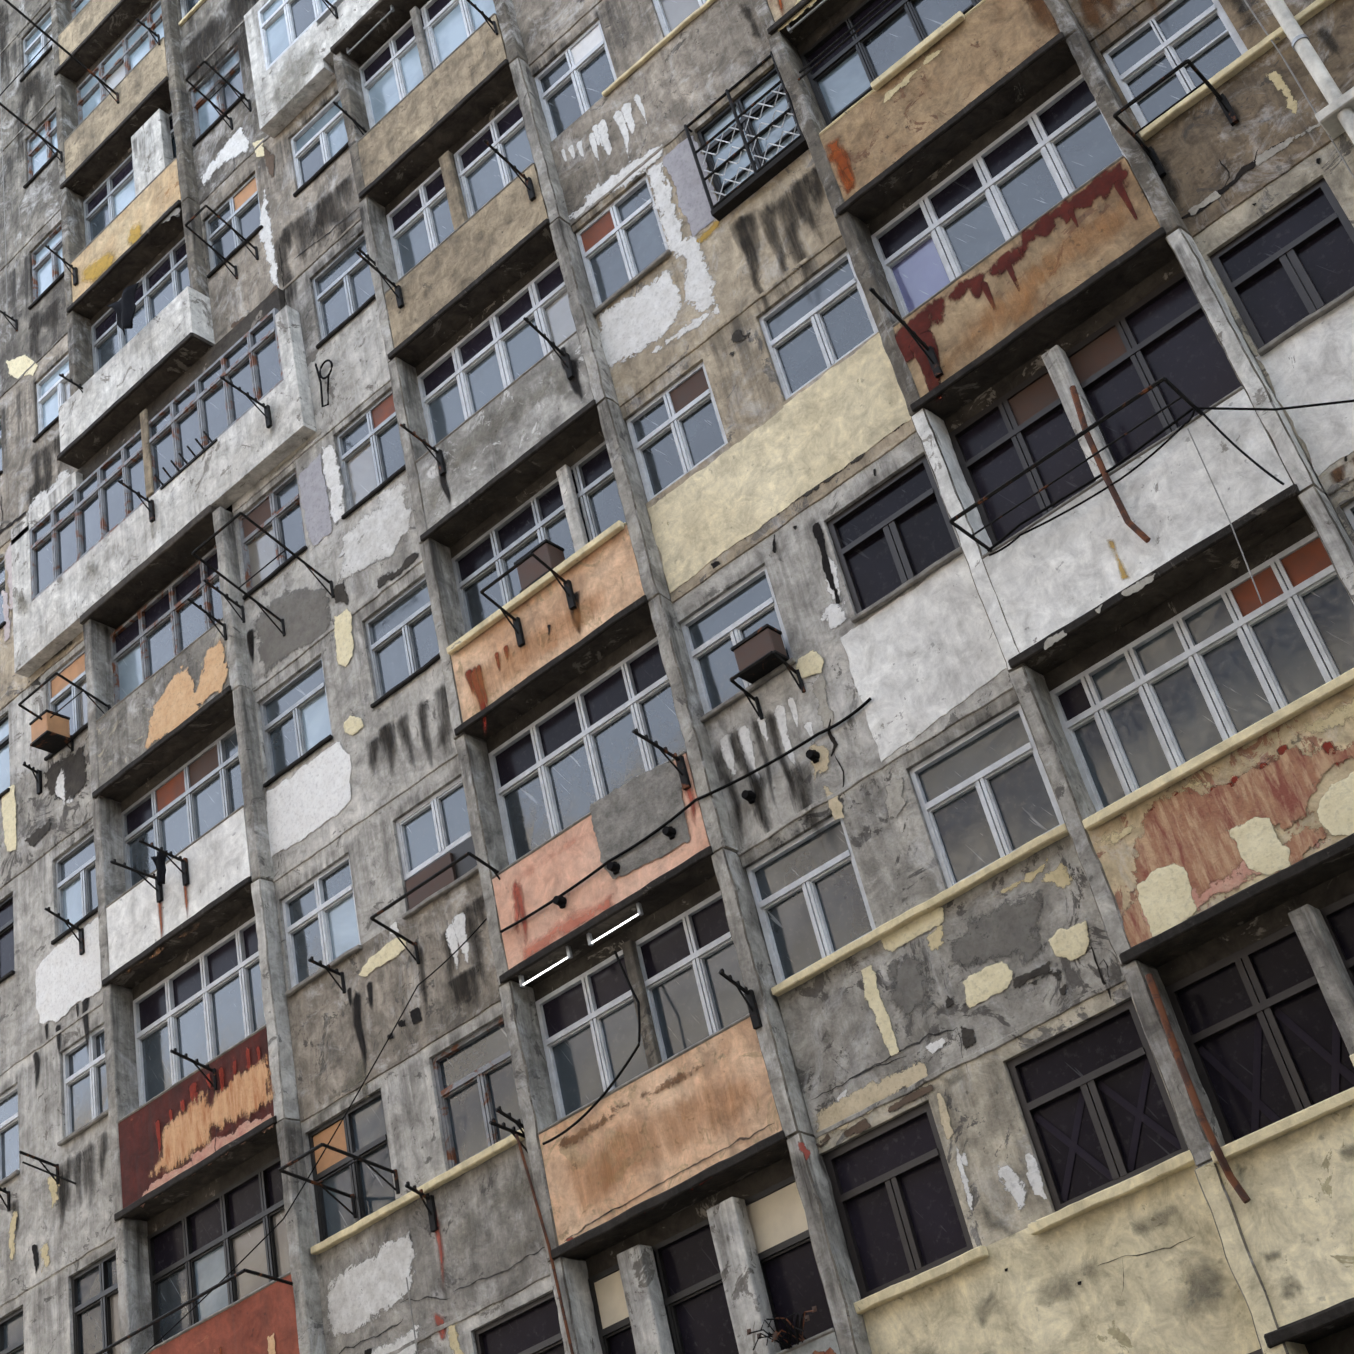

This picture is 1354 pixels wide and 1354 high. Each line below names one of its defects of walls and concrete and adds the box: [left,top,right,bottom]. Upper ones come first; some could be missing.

rust [1079,0,1115,27]
peeling [561,94,720,368]
damp [696,167,823,300]
peeling [895,162,1137,400]
peeling [145,639,228,749]
damp [369,686,449,767]
rust [465,645,509,730]
peeling [266,742,352,857]
peeling [1099,697,1354,947]
peeling [445,912,469,970]
peeling [140,1055,274,1208]
peeling [326,1231,417,1337]